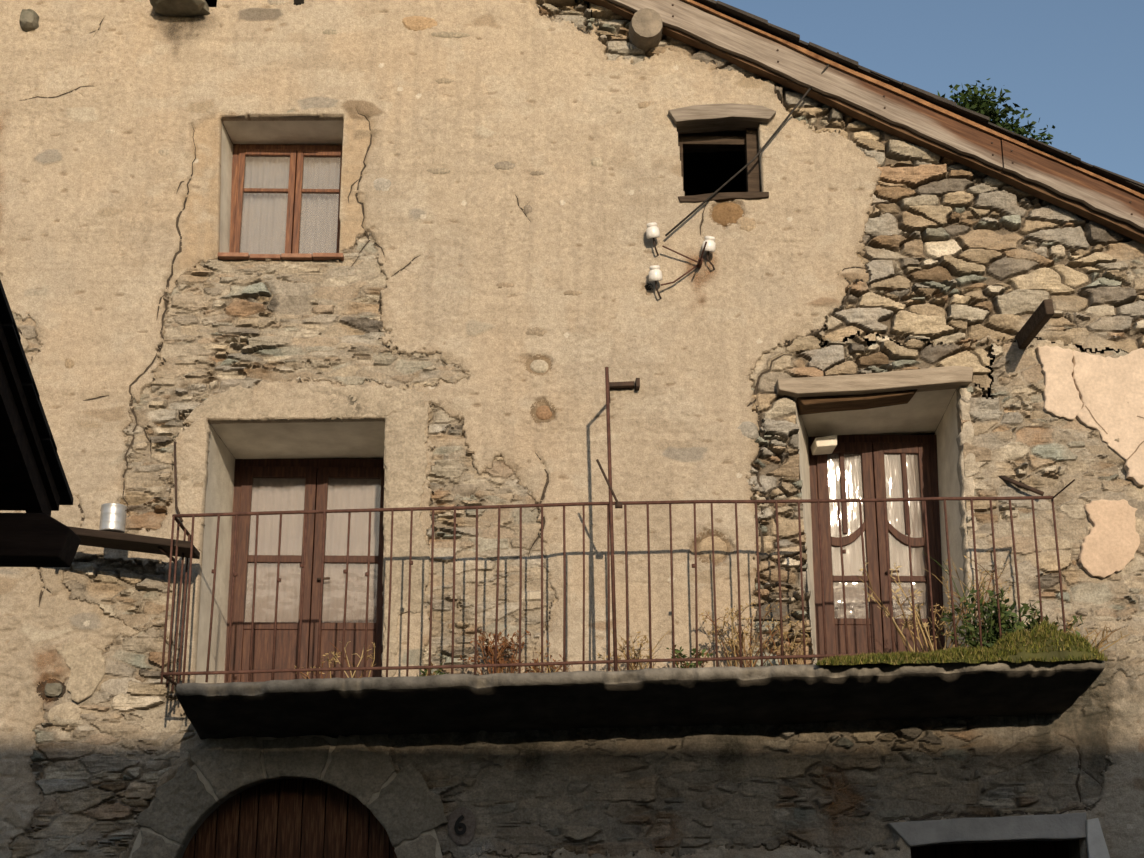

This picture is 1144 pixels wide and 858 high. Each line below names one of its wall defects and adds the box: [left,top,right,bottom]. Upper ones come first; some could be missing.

crack [83,126,196,525]
spalling [120,231,471,535]
crack [348,109,419,276]
spalling [388,0,1144,858]